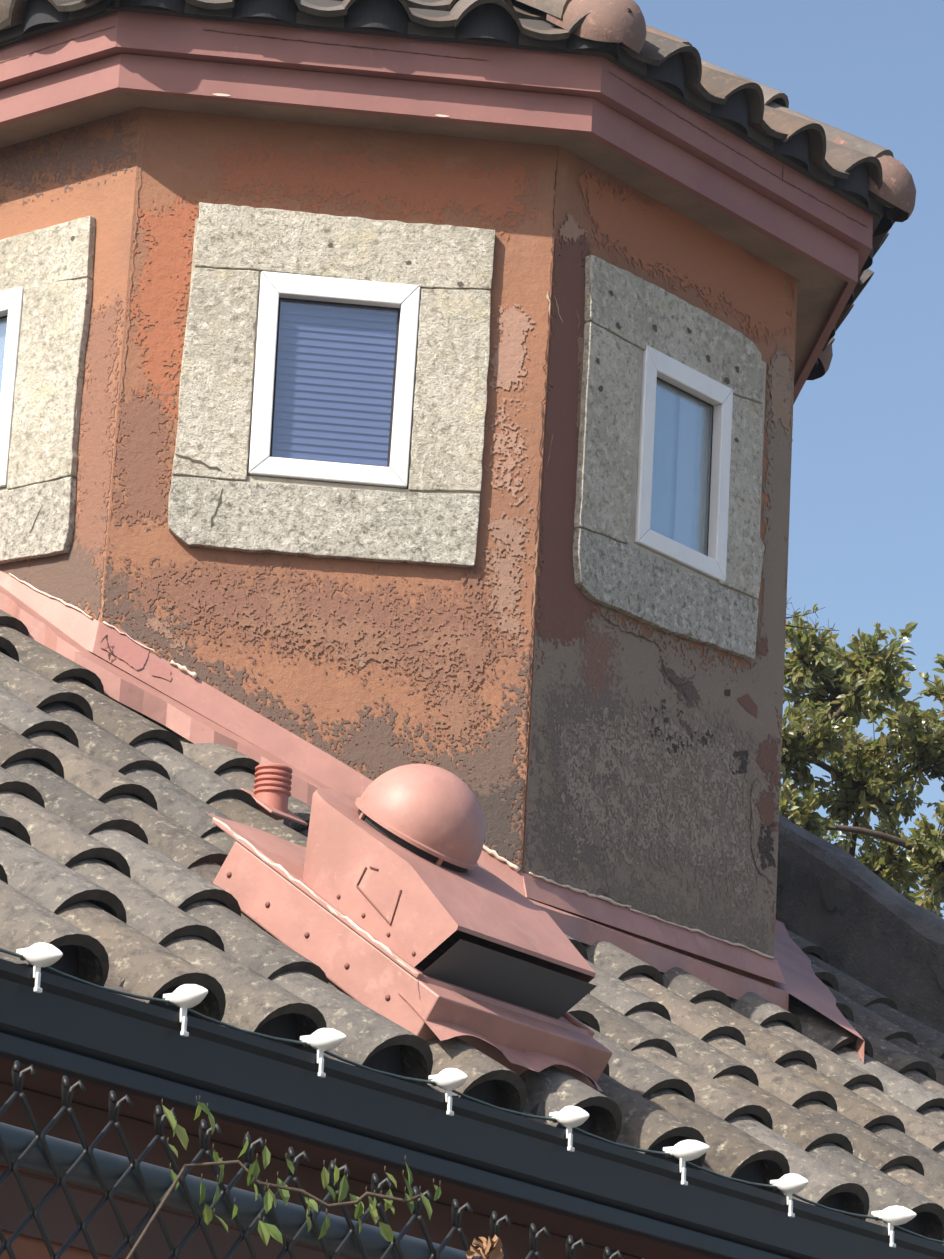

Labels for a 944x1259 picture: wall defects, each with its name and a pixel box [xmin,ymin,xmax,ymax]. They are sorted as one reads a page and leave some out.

crack [176,454,223,527]
water stain [0,227,794,956]
peeling [99,303,794,973]
peeling [667,946,769,983]